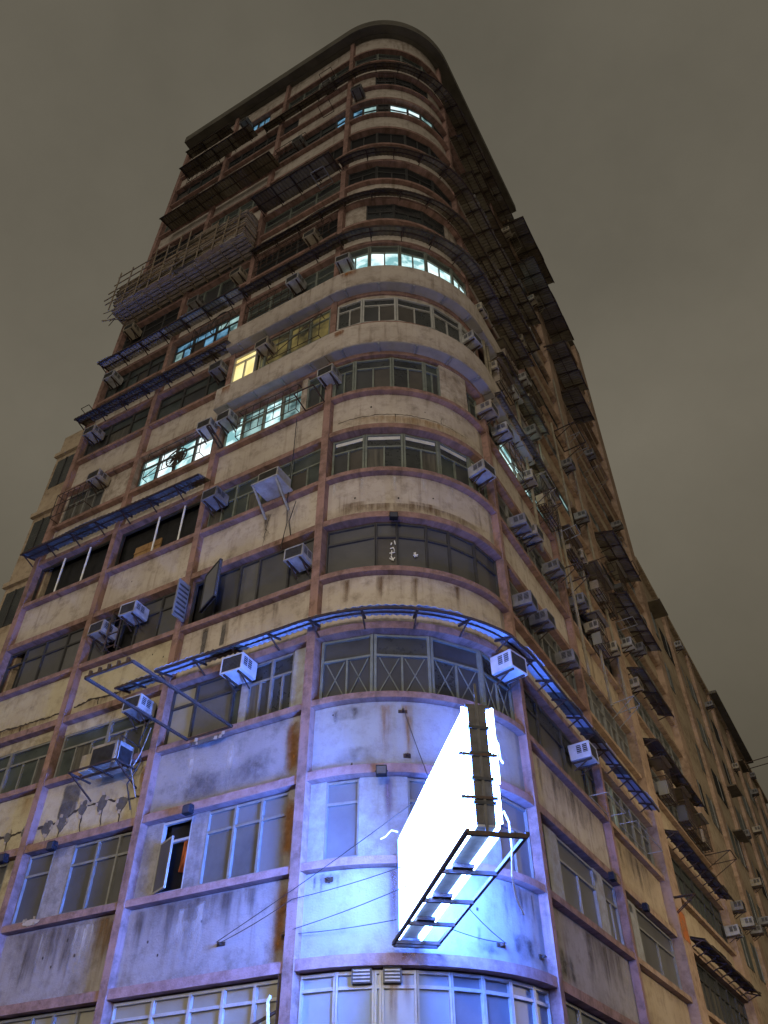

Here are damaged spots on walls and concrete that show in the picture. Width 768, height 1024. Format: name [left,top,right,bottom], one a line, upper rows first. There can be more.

corrosion [288,728,298,765]
peeling [41,784,128,838]